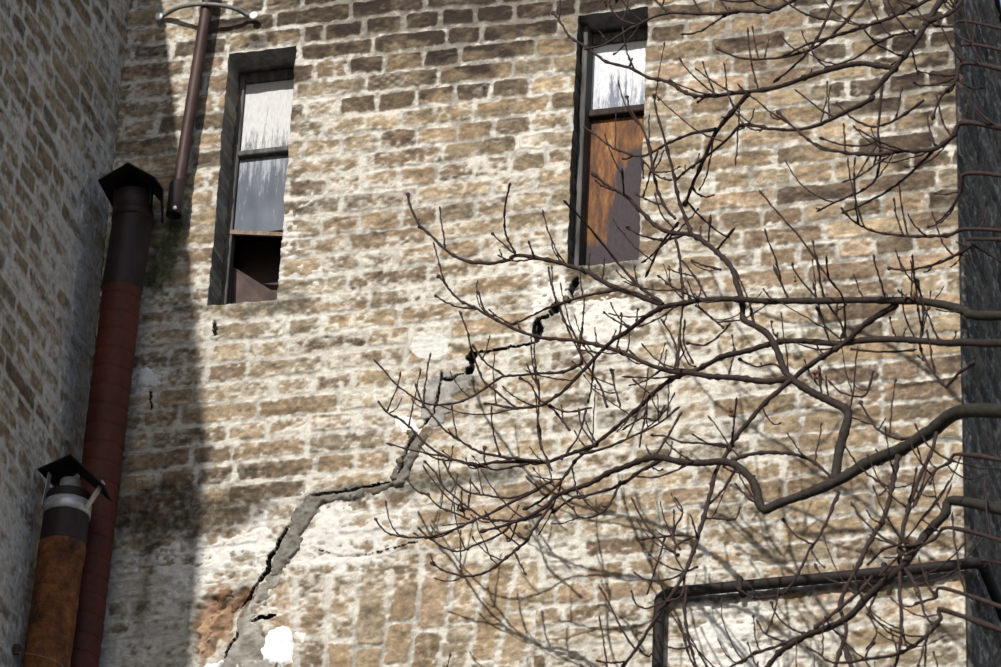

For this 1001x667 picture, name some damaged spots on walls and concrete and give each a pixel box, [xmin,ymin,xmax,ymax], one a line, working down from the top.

crack [315,277,580,496]
peeling [117,499,277,655]
crack [224,525,289,658]
crack [365,541,418,556]